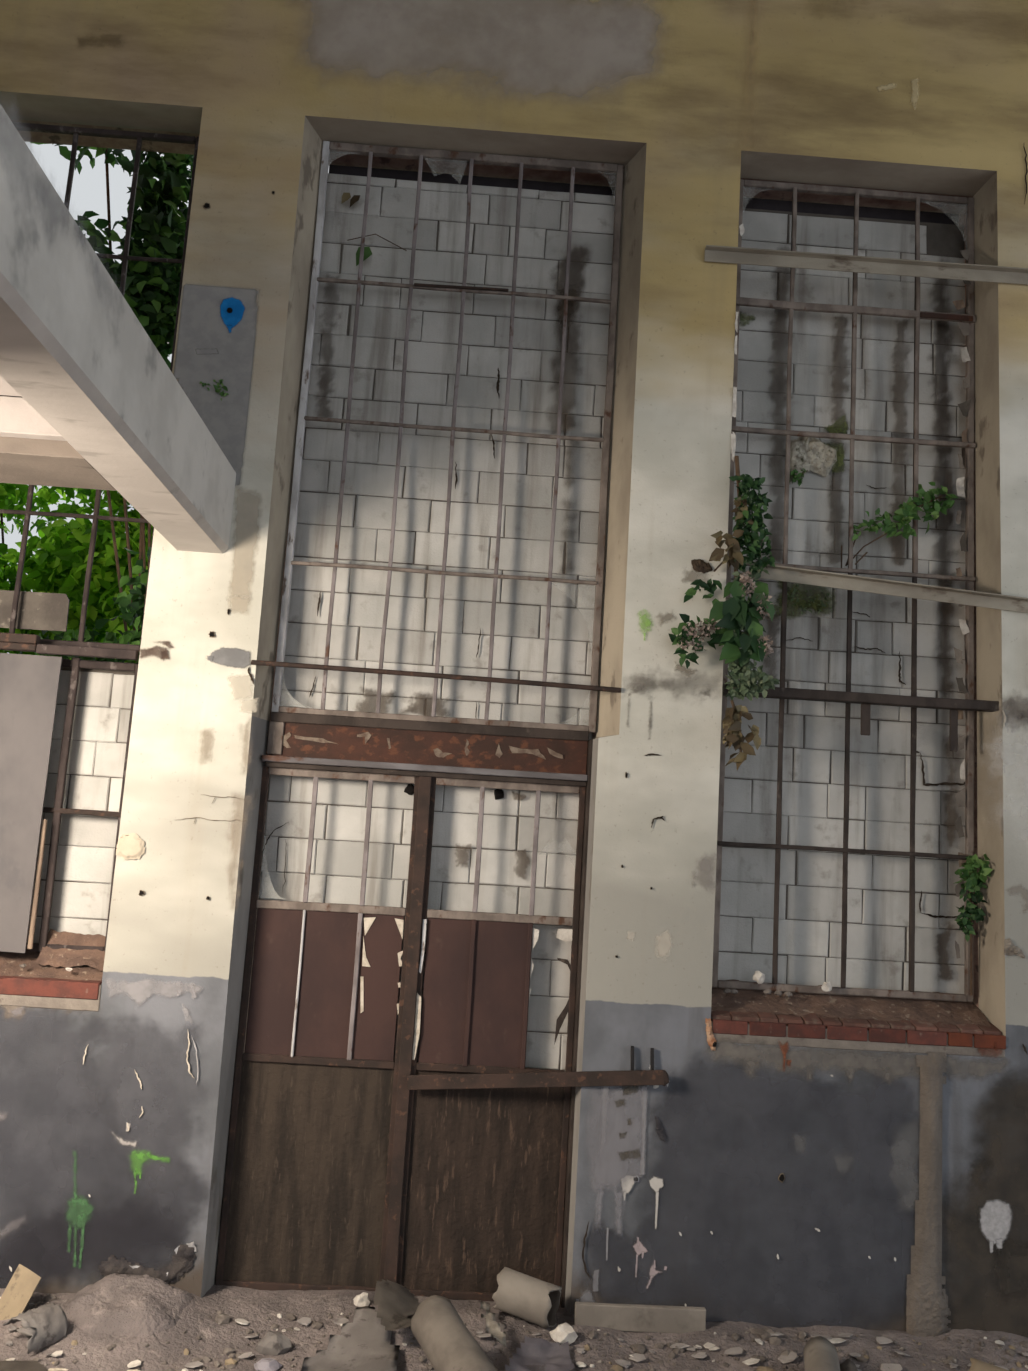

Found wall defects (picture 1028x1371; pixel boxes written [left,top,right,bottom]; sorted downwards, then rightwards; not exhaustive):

crack [1020,147,1028,204]
leakage [1000,698,1028,728]
spalling [705,1018,717,1051]
leakage [0,980,204,1285]
leakage [0,1275,12,1288]